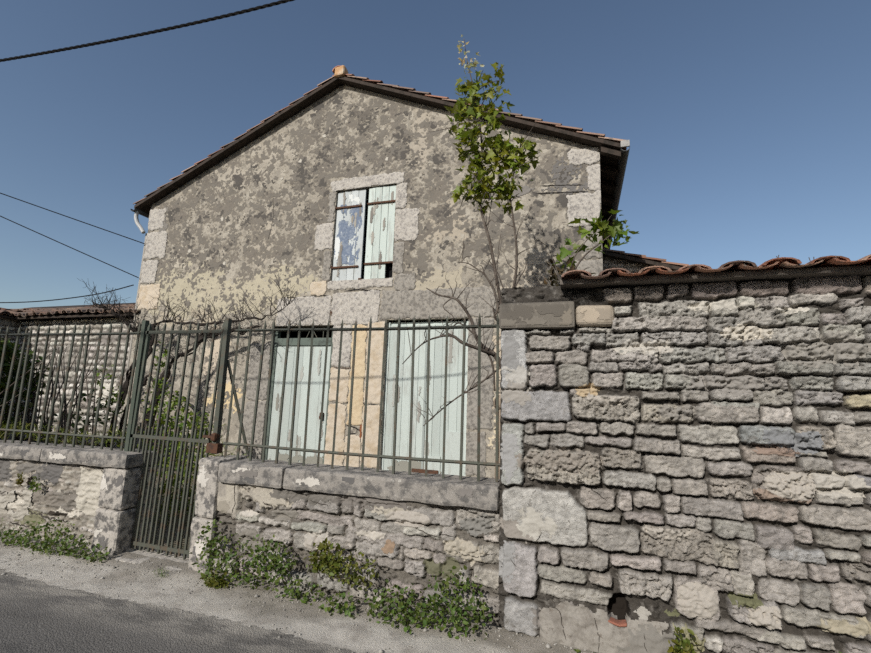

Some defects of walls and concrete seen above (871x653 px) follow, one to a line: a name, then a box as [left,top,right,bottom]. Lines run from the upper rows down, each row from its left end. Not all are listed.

peeling [414,266,464,291]
spalling [607,593,651,620]